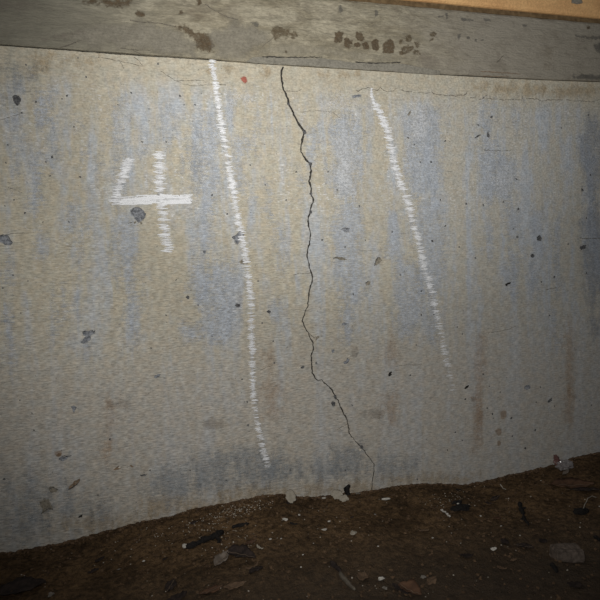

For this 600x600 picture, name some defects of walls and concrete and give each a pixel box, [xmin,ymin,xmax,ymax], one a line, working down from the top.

crack [262,40,374,489]
water stain [328,99,364,302]